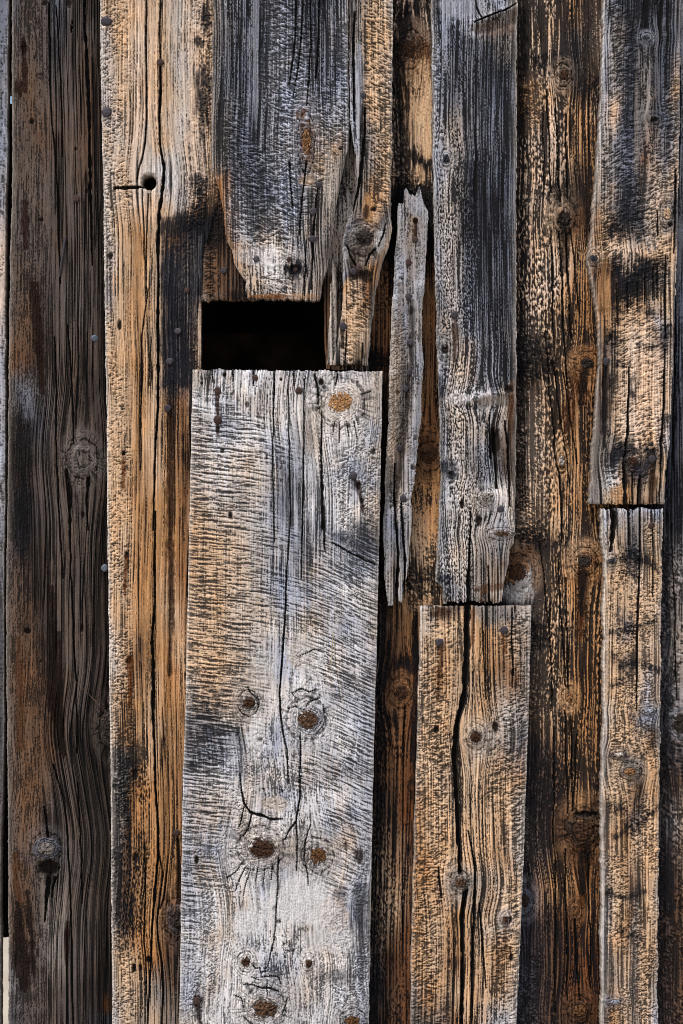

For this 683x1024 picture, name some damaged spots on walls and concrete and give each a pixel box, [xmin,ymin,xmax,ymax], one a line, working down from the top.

crack [49,0,167,1011]
crack [212,331,406,1009]
crack [438,512,490,1024]
crack [508,617,516,683]